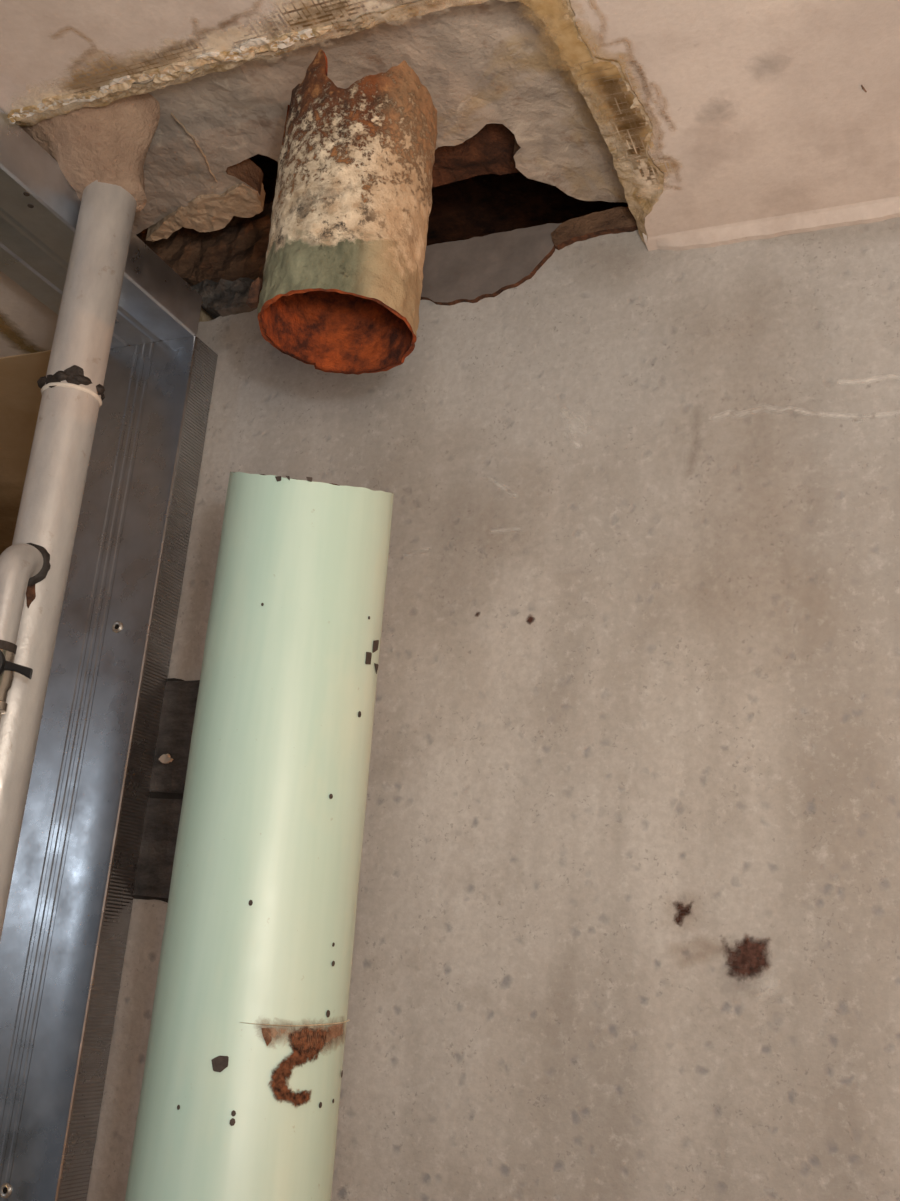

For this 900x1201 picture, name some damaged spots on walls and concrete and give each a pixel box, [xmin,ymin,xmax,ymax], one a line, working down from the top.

water stain [7,0,419,123]
water stain [531,0,674,194]
spalling [15,0,664,319]
rust [674,903,691,925]
rust [726,937,769,978]